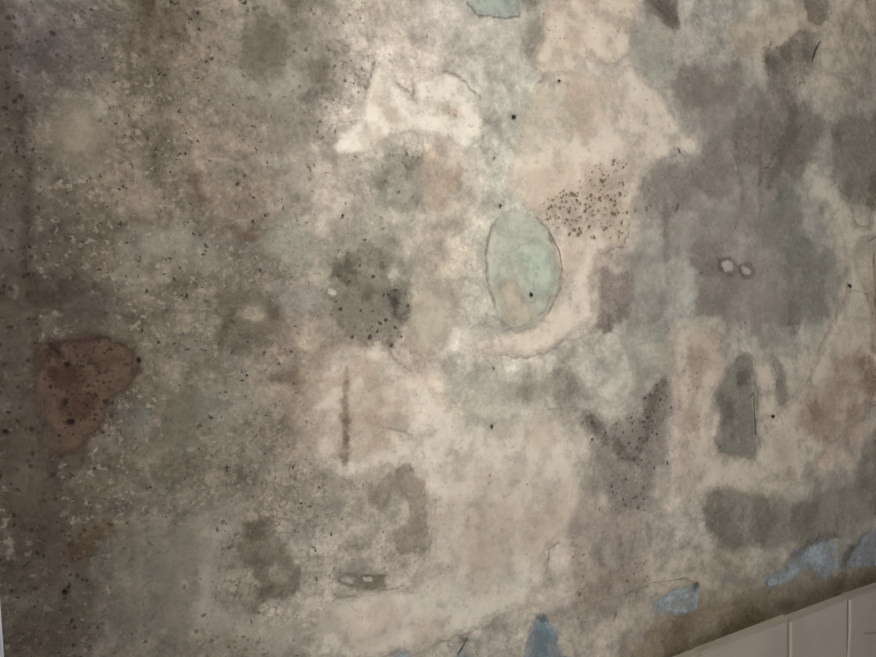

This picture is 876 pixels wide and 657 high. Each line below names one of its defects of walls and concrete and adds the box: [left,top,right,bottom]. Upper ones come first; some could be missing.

peeling [334,66,483,154]
peeling [469,0,698,356]
damp [223,294,294,346]
damp [717,354,755,456]
peeling [306,344,590,657]